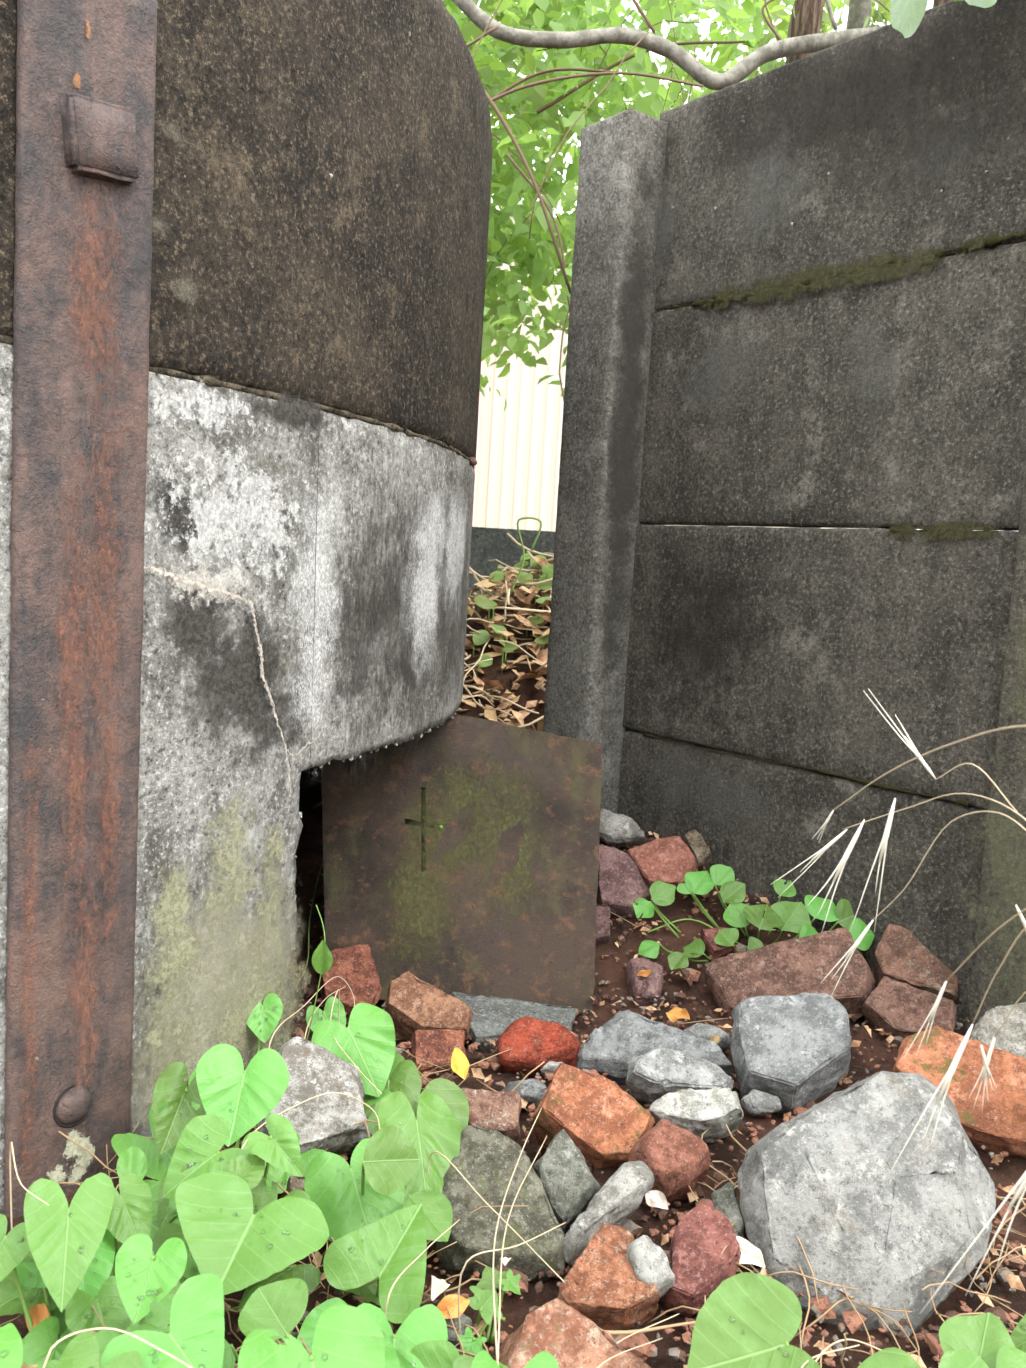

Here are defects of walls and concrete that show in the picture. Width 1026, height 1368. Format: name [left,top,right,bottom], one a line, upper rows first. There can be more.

crack [150,400,324,793]
damp [144,385,471,767]